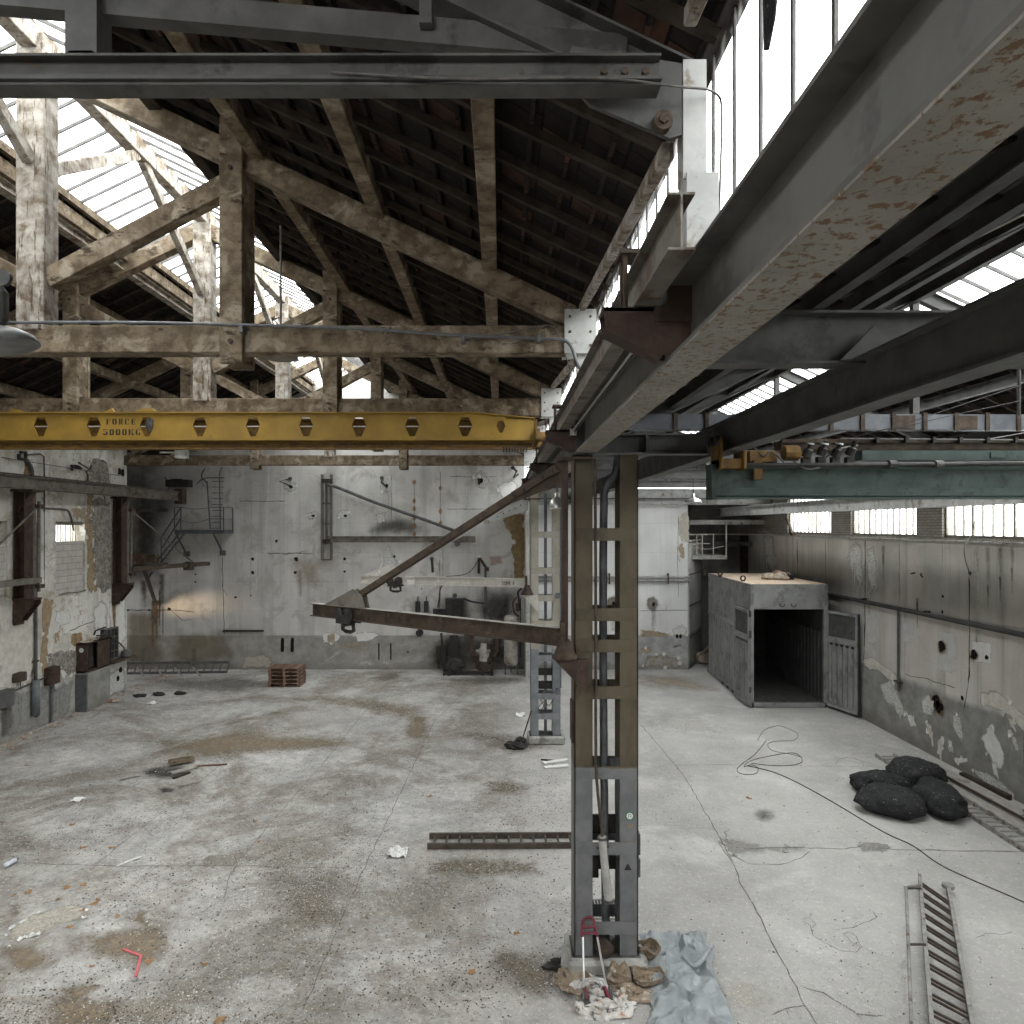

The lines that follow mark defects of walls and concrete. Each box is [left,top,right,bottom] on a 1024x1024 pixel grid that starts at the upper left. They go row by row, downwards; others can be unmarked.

spalling [85,457,113,593]
spalling [503,513,524,578]
spalling [639,624,688,669]
hole [932,695,944,716]
crack [689,828,899,865]
crack [804,911,886,957]
crack [773,987,883,1018]